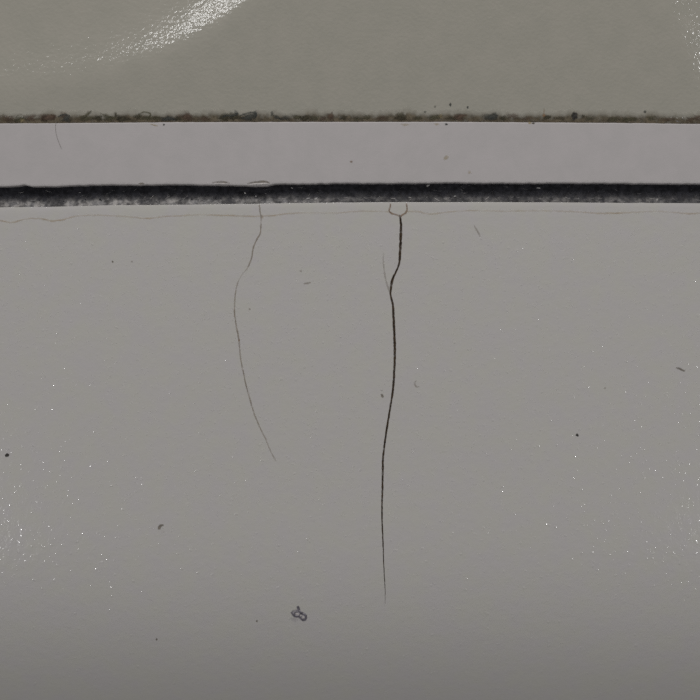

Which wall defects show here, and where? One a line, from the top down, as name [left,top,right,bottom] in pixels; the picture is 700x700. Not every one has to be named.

crack [381,203,408,593]